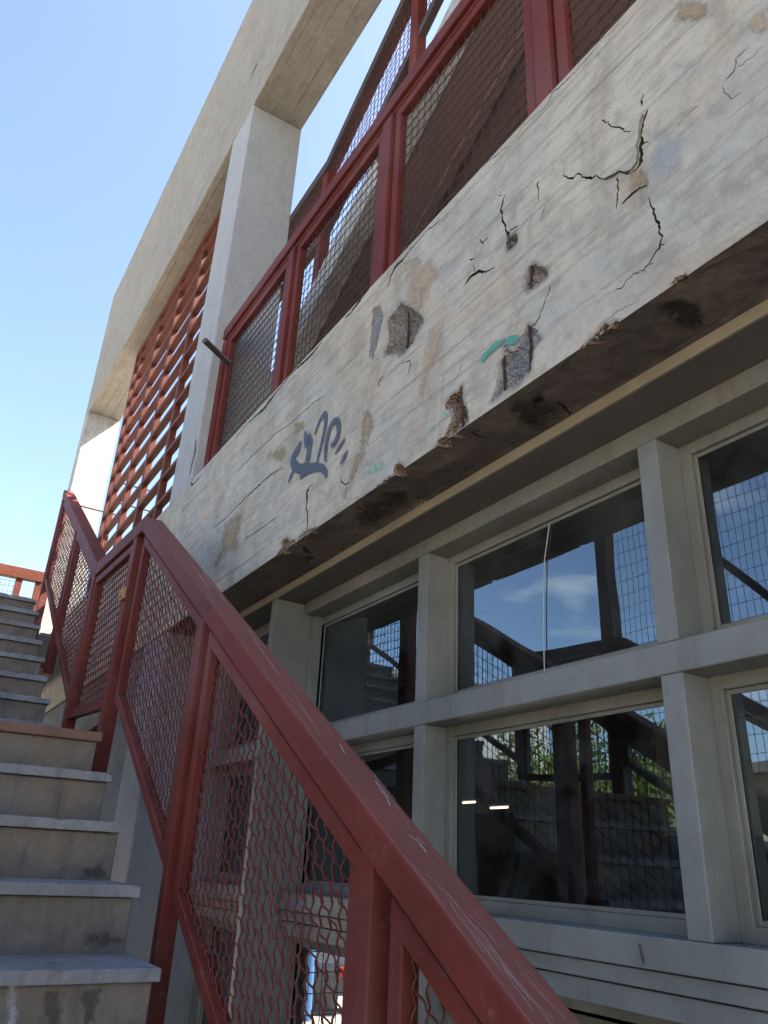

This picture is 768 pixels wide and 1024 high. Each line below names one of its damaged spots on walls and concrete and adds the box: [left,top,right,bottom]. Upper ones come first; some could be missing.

crack [722,44,765,99]
crack [464,182,546,286]
crack [563,95,666,318]
spalling [525,263,548,291]
spalling [369,302,424,360]
spalling [491,324,541,401]
spalling [579,320,623,349]
water stain [660,300,702,328]
crack [214,342,324,527]
spalling [437,386,469,448]
spalling [377,462,408,487]
crack [302,486,312,554]